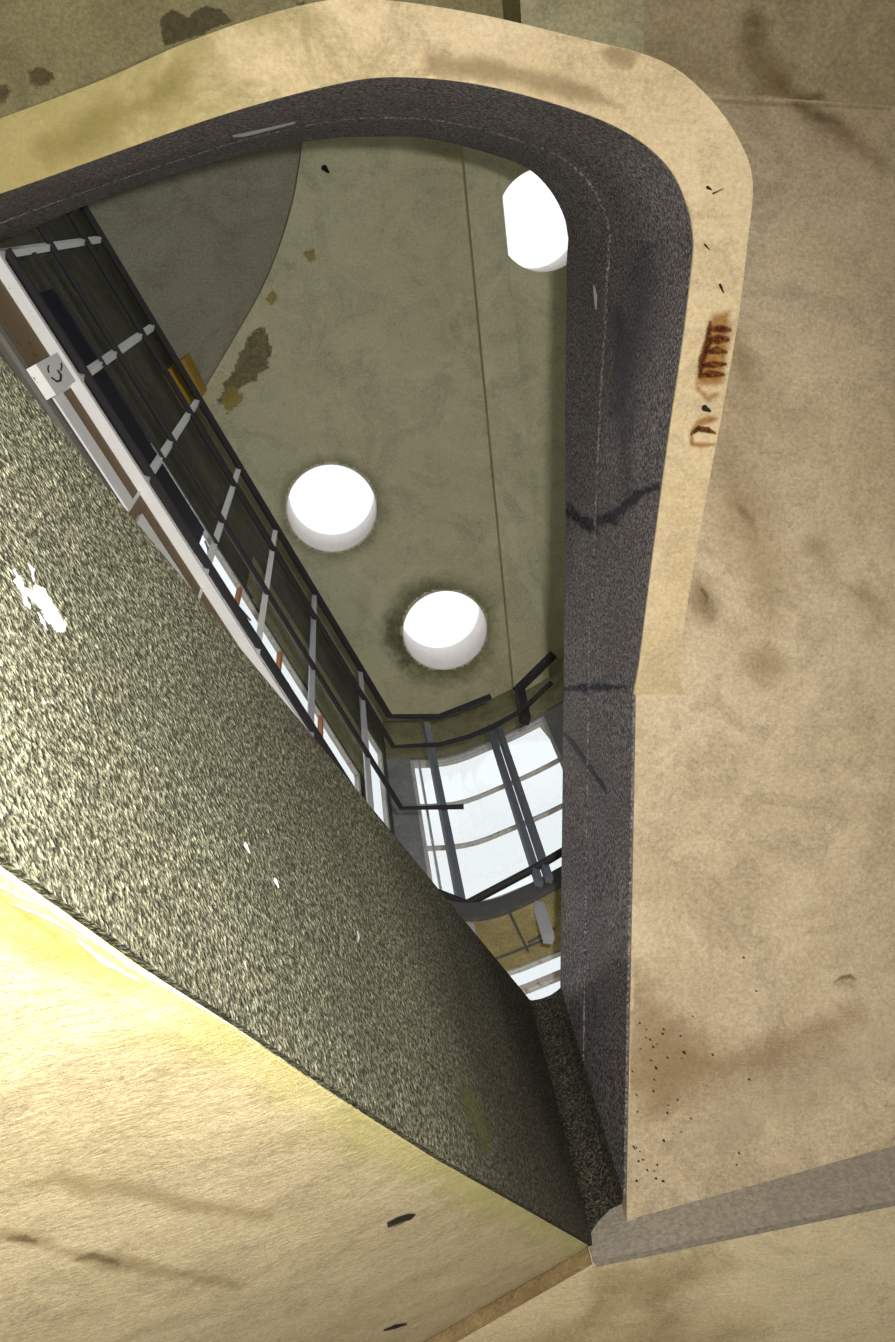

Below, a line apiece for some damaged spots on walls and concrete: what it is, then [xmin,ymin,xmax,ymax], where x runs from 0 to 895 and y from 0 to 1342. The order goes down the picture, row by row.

corrosion [690,314,731,447]
peeling [13,563,67,632]